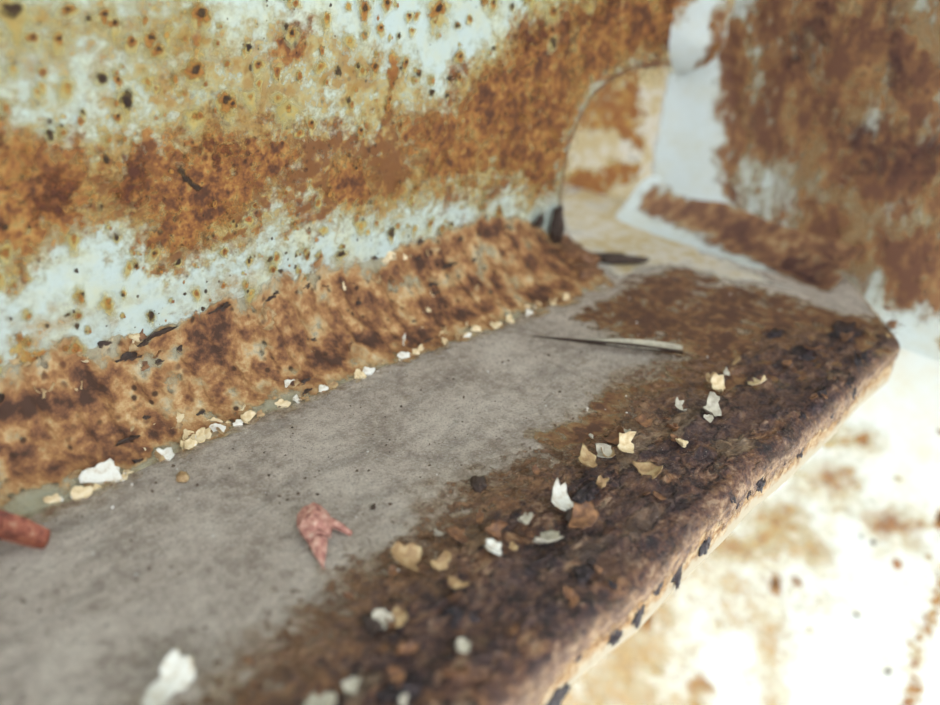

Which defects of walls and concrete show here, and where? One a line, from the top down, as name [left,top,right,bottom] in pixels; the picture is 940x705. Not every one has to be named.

corrosion [0,0,696,511]
corrosion [200,264,902,705]
peeling [551,478,599,529]
peeling [578,431,637,468]
peeling [703,373,725,417]
corrosion [638,0,940,318]